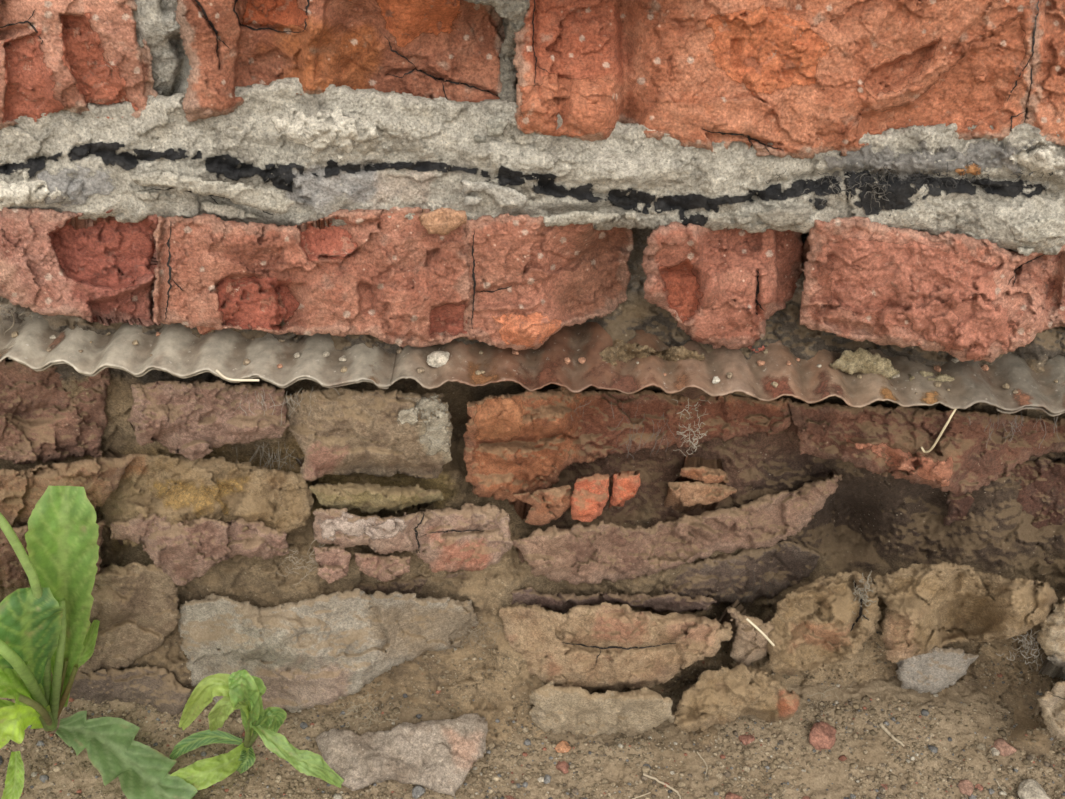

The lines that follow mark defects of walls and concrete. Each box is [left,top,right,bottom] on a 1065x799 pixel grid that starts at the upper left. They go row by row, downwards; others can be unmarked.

crack [195,0,310,69]
spalling [474,73,619,143]
crack [703,129,781,153]
spalling [706,5,830,96]
spalling [854,16,1026,148]
crack [1007,1,1039,133]
spalling [47,211,157,290]
peeling [543,211,636,227]
spalling [825,235,997,335]
rust [762,376,794,398]
rust [813,372,843,399]
rust [921,391,938,404]